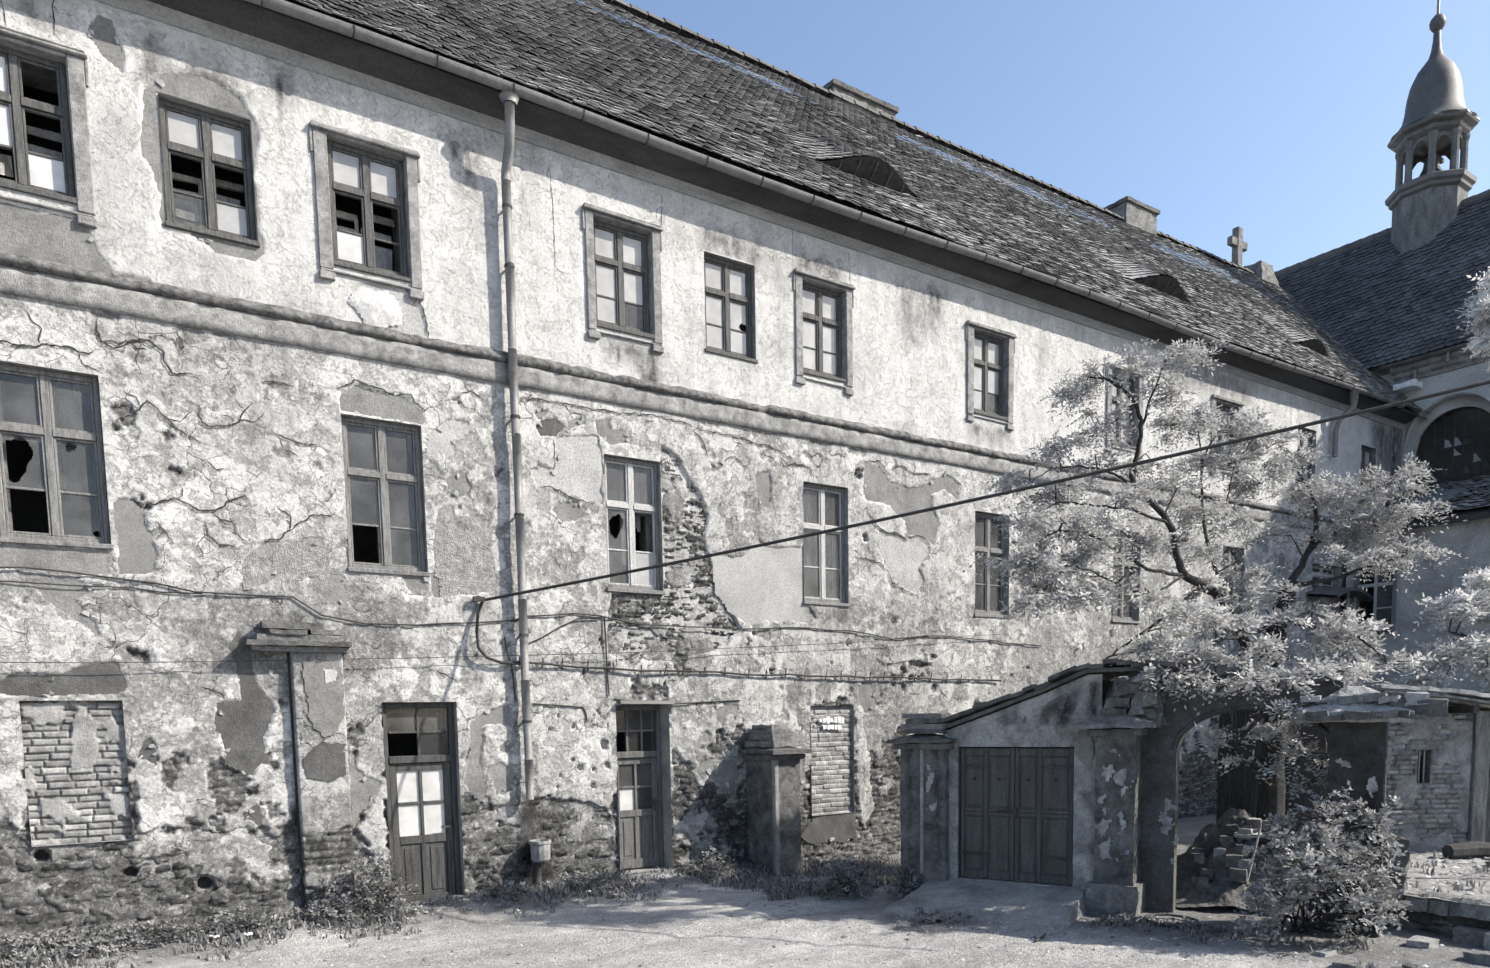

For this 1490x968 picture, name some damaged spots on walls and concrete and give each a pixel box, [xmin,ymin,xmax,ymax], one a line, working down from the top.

spalling [87,15,124,73]
crack [0,312,336,552]
spalling [533,406,632,521]
flaking render [607,449,816,663]
crack [519,398,940,600]
spalling [863,463,961,593]
spalling [137,738,158,765]
flaking render [0,804,302,939]
spalling [214,631,275,775]
spalling [302,660,381,829]
flaking render [463,705,619,896]
flaking render [671,703,744,866]